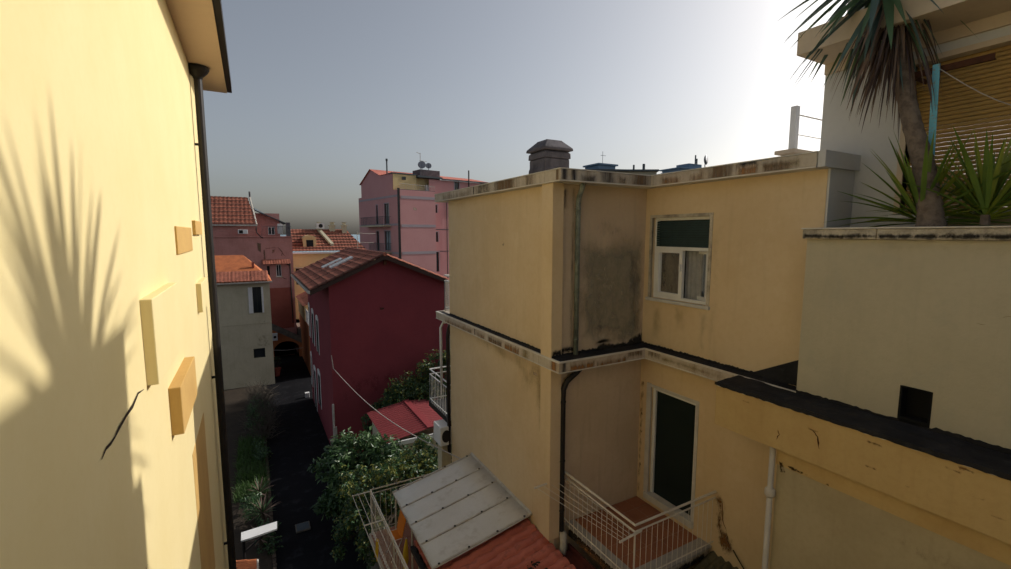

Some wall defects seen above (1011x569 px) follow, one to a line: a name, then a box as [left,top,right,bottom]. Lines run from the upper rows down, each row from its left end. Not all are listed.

rust [717,498,731,552]